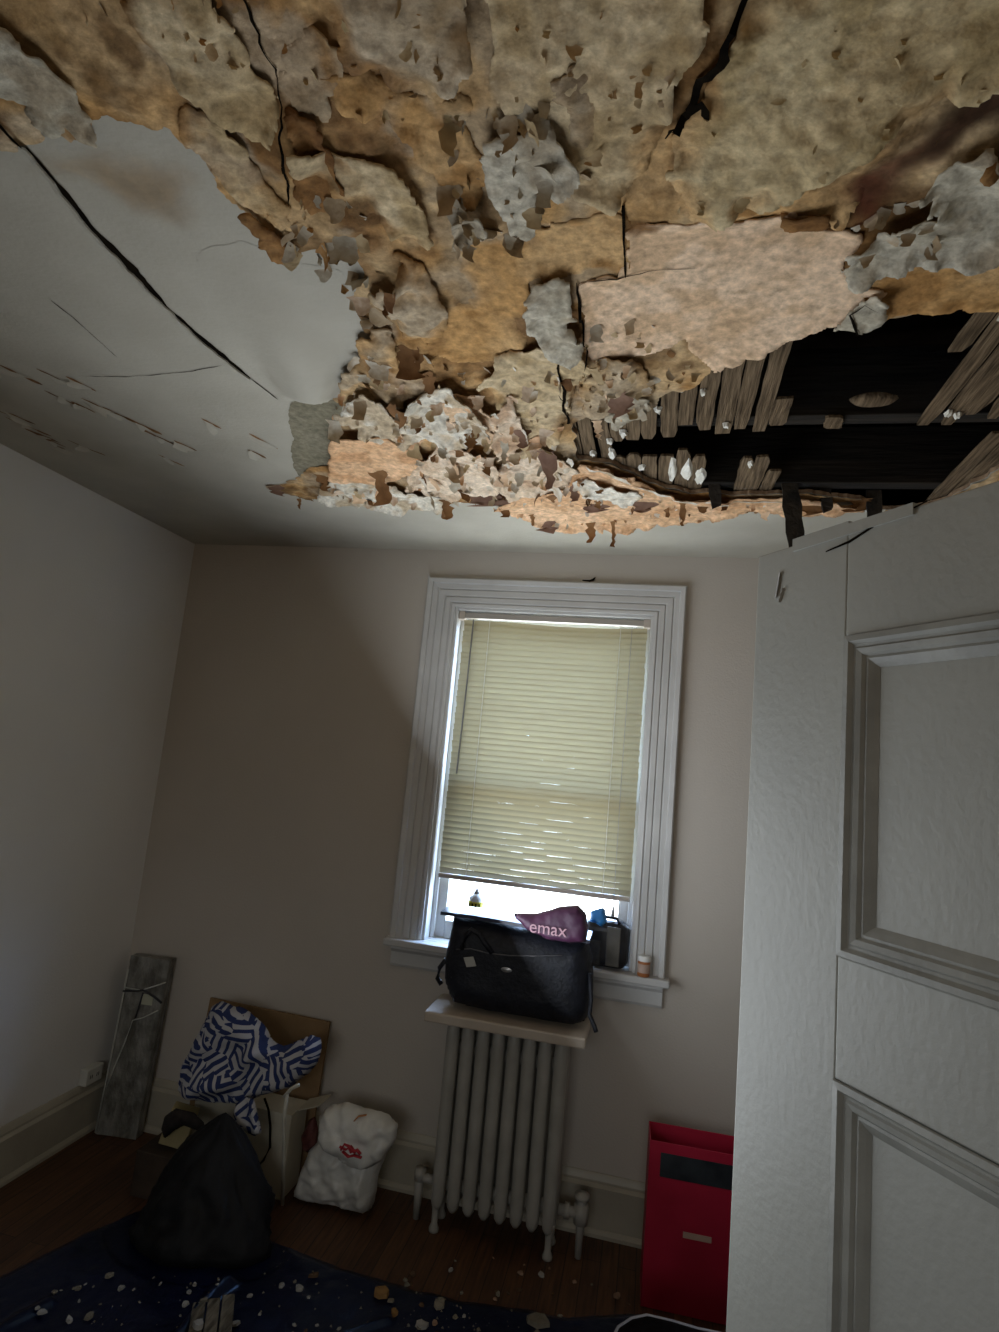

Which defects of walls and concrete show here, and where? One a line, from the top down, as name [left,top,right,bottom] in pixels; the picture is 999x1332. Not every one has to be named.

crack [243,0,290,207]
crack [665,0,748,139]
damp [853,94,999,214]
crack [0,125,277,399]
peeling [0,0,999,547]